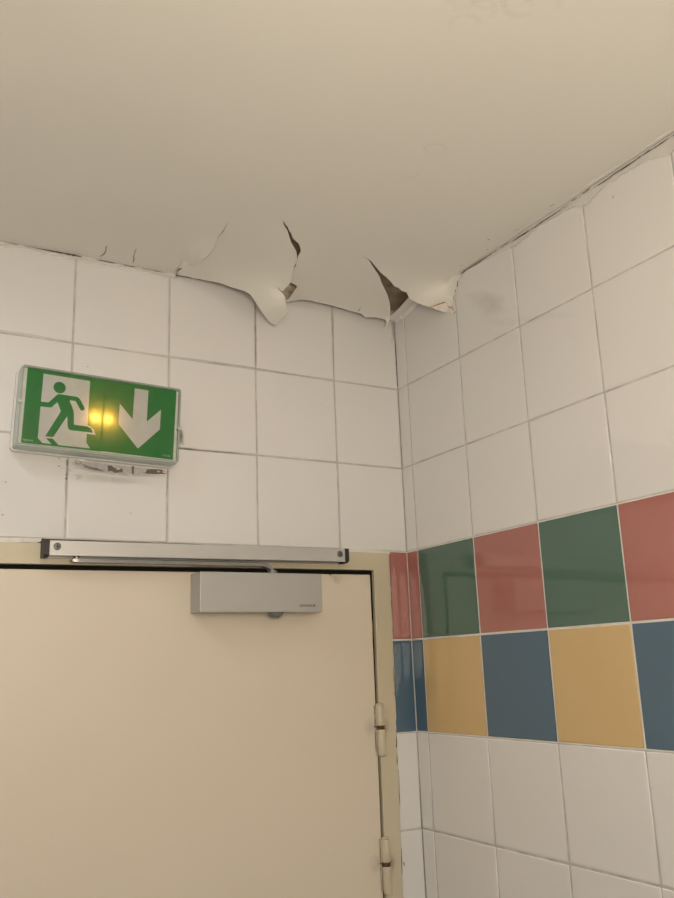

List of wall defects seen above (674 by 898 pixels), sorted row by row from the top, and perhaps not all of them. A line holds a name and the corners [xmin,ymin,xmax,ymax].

crack [7,242,212,282]
peeling [176,216,461,329]
crack [453,135,674,300]